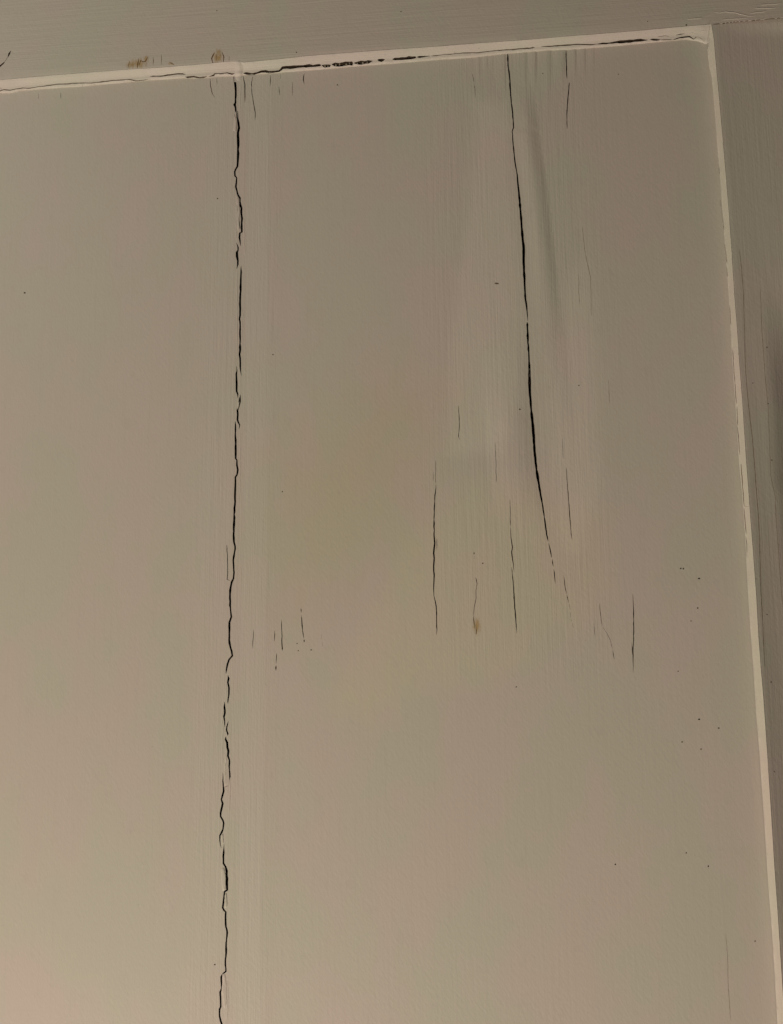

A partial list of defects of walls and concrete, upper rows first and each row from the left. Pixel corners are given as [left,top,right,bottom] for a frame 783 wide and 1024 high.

crack [0,83,83,99]
crack [93,34,696,1024]